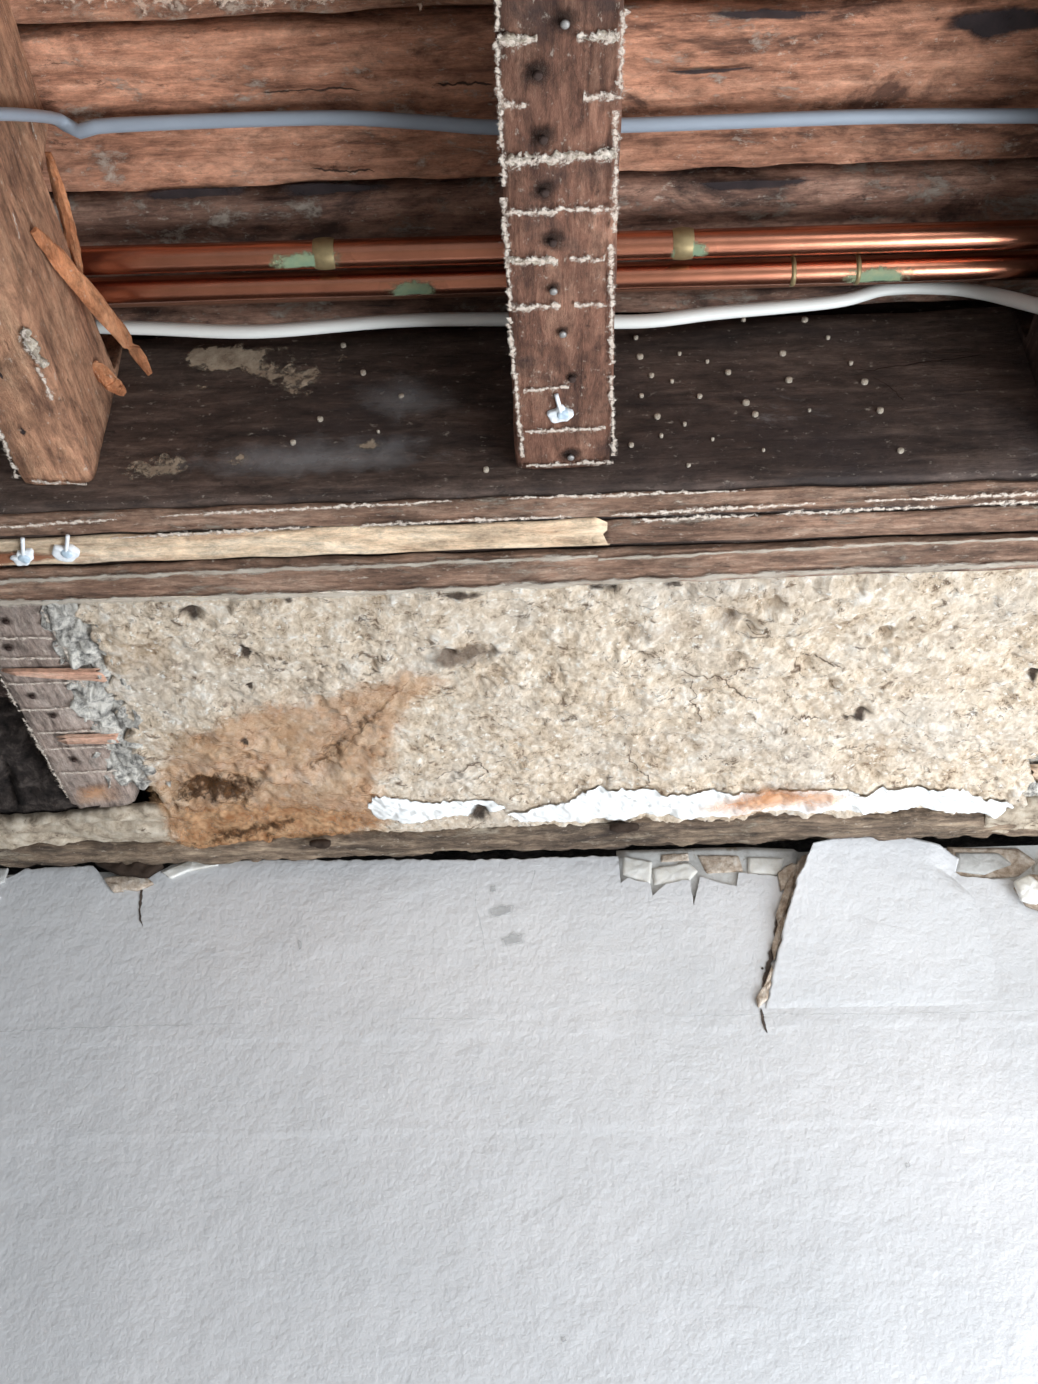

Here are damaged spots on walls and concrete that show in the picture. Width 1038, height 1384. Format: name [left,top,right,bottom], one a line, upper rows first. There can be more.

damp [307,708,383,768]
damp [172,774,378,849]
flaking render [616,847,798,896]
flaking render [947,847,1038,911]
crack [756,854,808,1032]